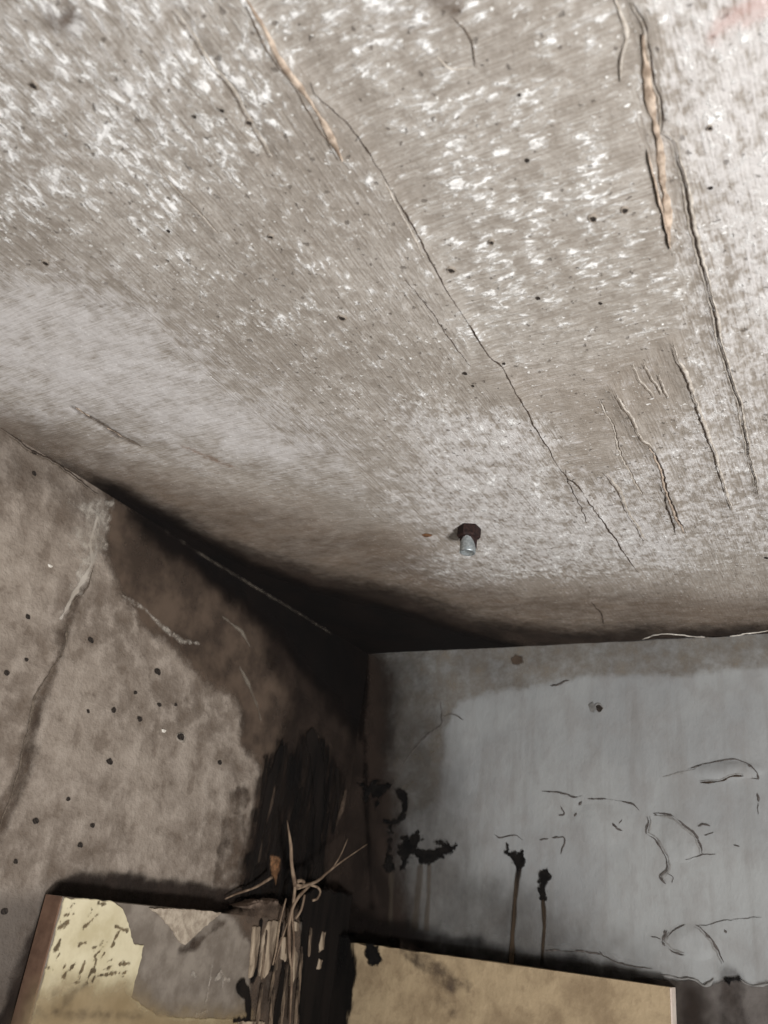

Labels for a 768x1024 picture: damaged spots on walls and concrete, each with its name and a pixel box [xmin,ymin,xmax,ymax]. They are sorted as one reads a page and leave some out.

crack [245,4,733,572]
crack [630,3,759,494]
leakage [0,464,768,1024]
crack [494,791,740,884]
crack [544,917,760,969]
crack [664,758,760,814]